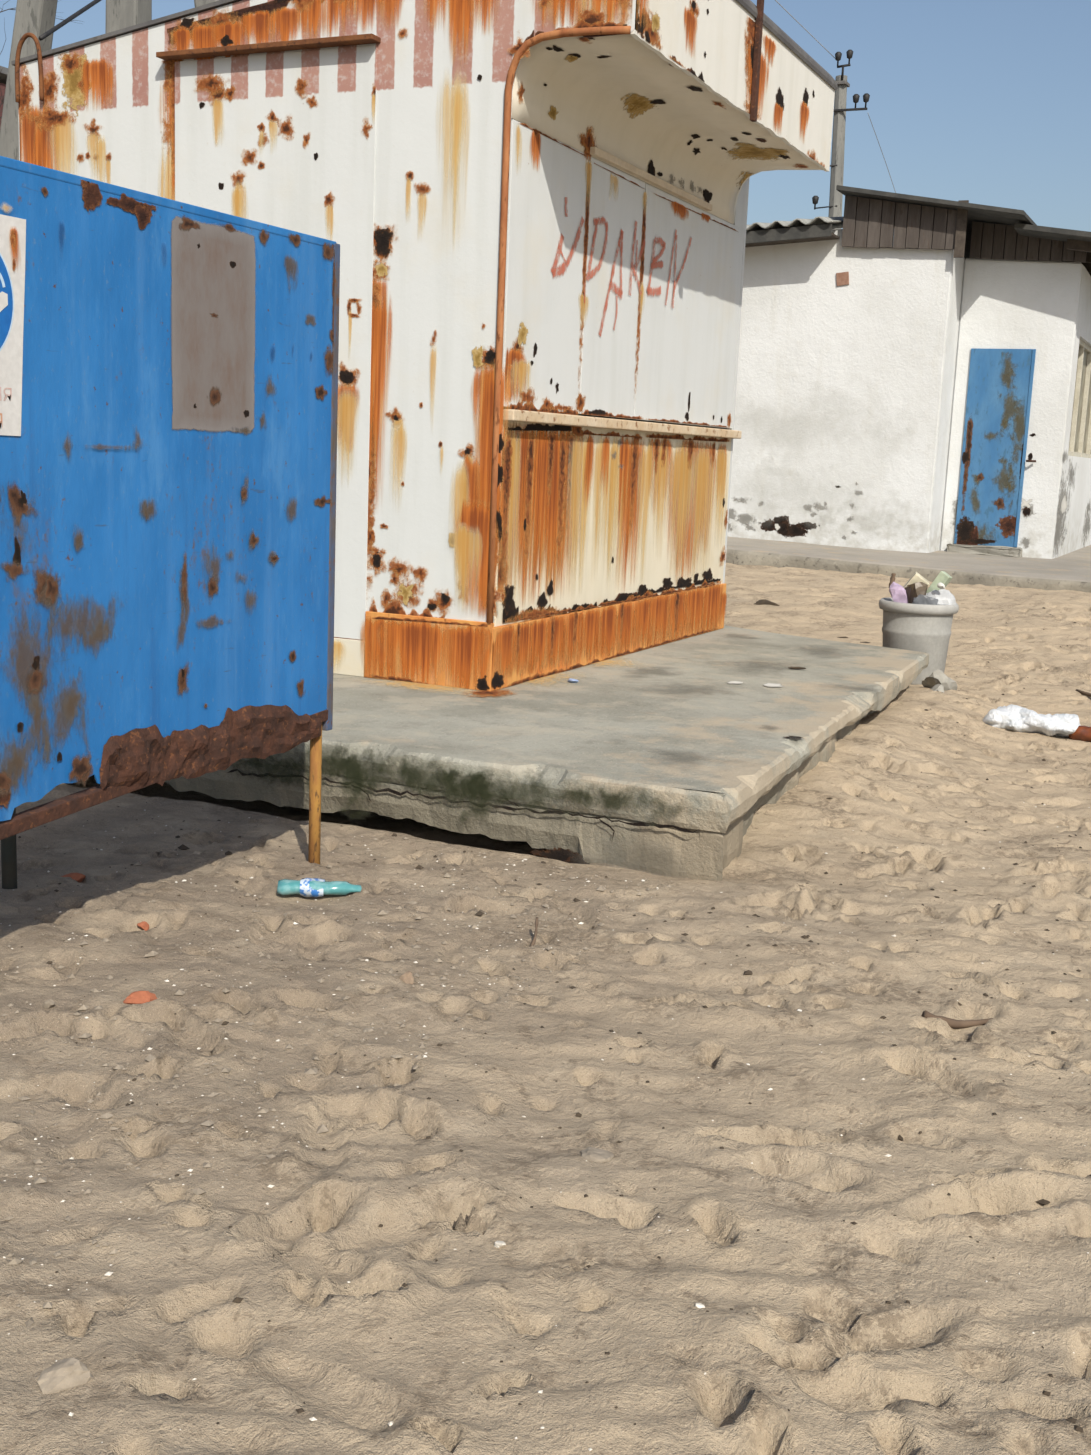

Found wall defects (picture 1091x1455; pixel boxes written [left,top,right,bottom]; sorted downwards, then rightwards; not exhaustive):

rust [19,0,407,230]
rust [427,0,494,52]
rust [509,0,646,59]
rust [669,0,723,108]
rust [745,17,776,118]
rust [406,171,431,219]
rust [517,122,738,386]
rust [305,192,731,697]
rust [956,353,1025,545]
spalling [728,498,827,538]
rust [178,554,223,643]
rust [69,680,322,790]